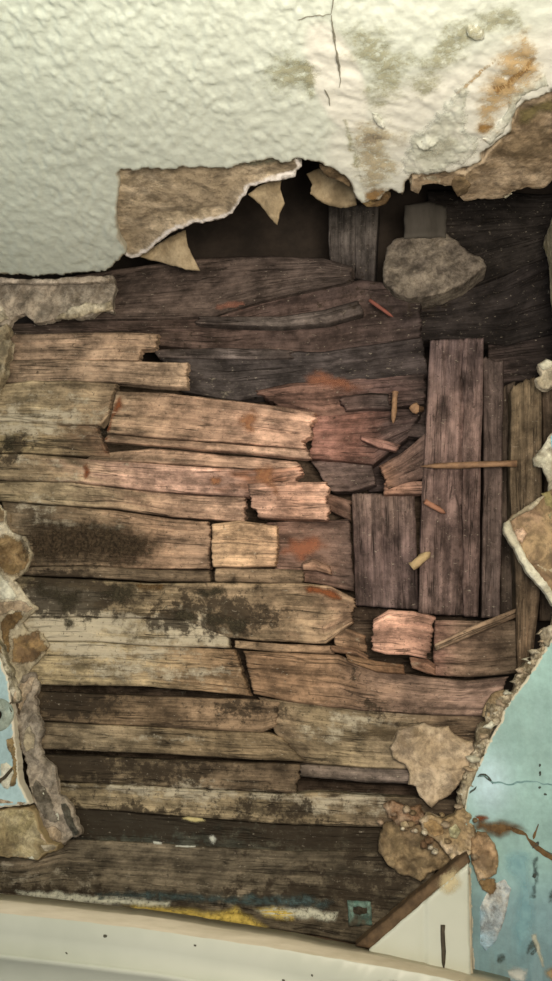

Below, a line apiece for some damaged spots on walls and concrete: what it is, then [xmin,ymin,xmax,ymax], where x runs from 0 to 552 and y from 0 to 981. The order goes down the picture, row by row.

damp [272,60,313,96]
crack [299,0,341,105]
damp [354,33,411,91]
damp [416,10,514,94]
spalling [0,74,552,285]
damp [348,128,395,200]
peeling [55,300,113,320]
peeling [539,359,552,371]
damp [22,520,155,566]
peeling [390,433,552,810]
spalling [0,505,84,861]
crack [470,774,552,793]